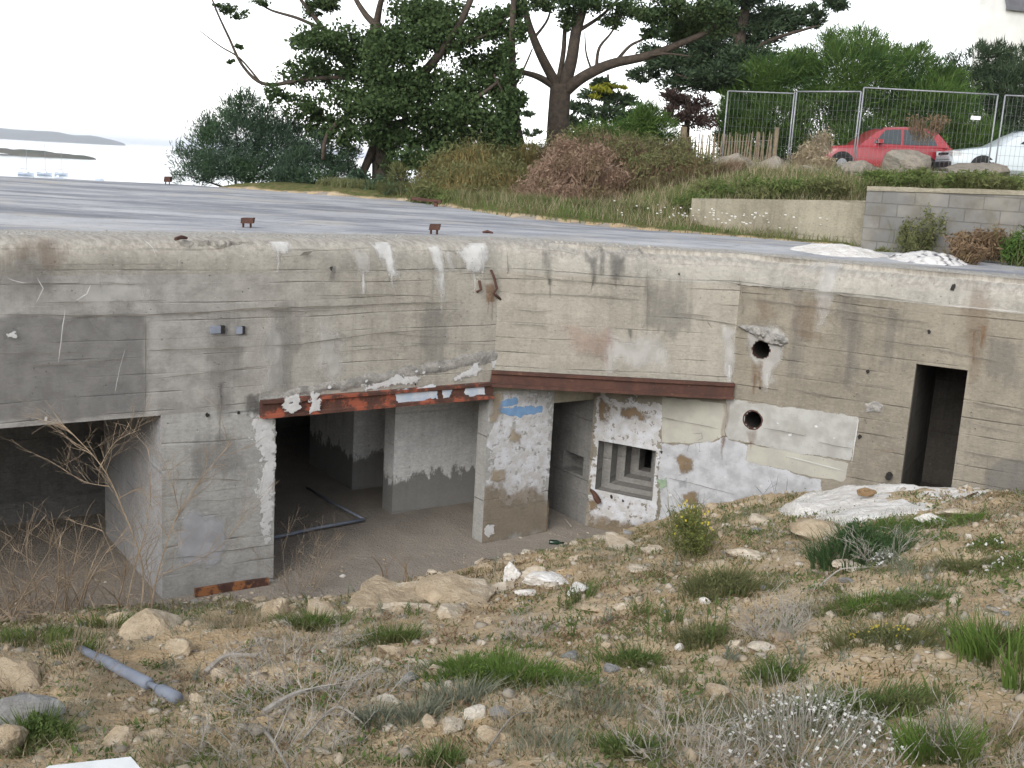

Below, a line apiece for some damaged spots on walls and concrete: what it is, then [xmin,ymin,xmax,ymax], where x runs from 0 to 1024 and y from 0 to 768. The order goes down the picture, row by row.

damp [271,242,288,259]
damp [375,242,396,278]
damp [430,246,444,292]
damp [459,243,487,283]
peeling [247,350,554,545]
peeling [588,393,822,527]